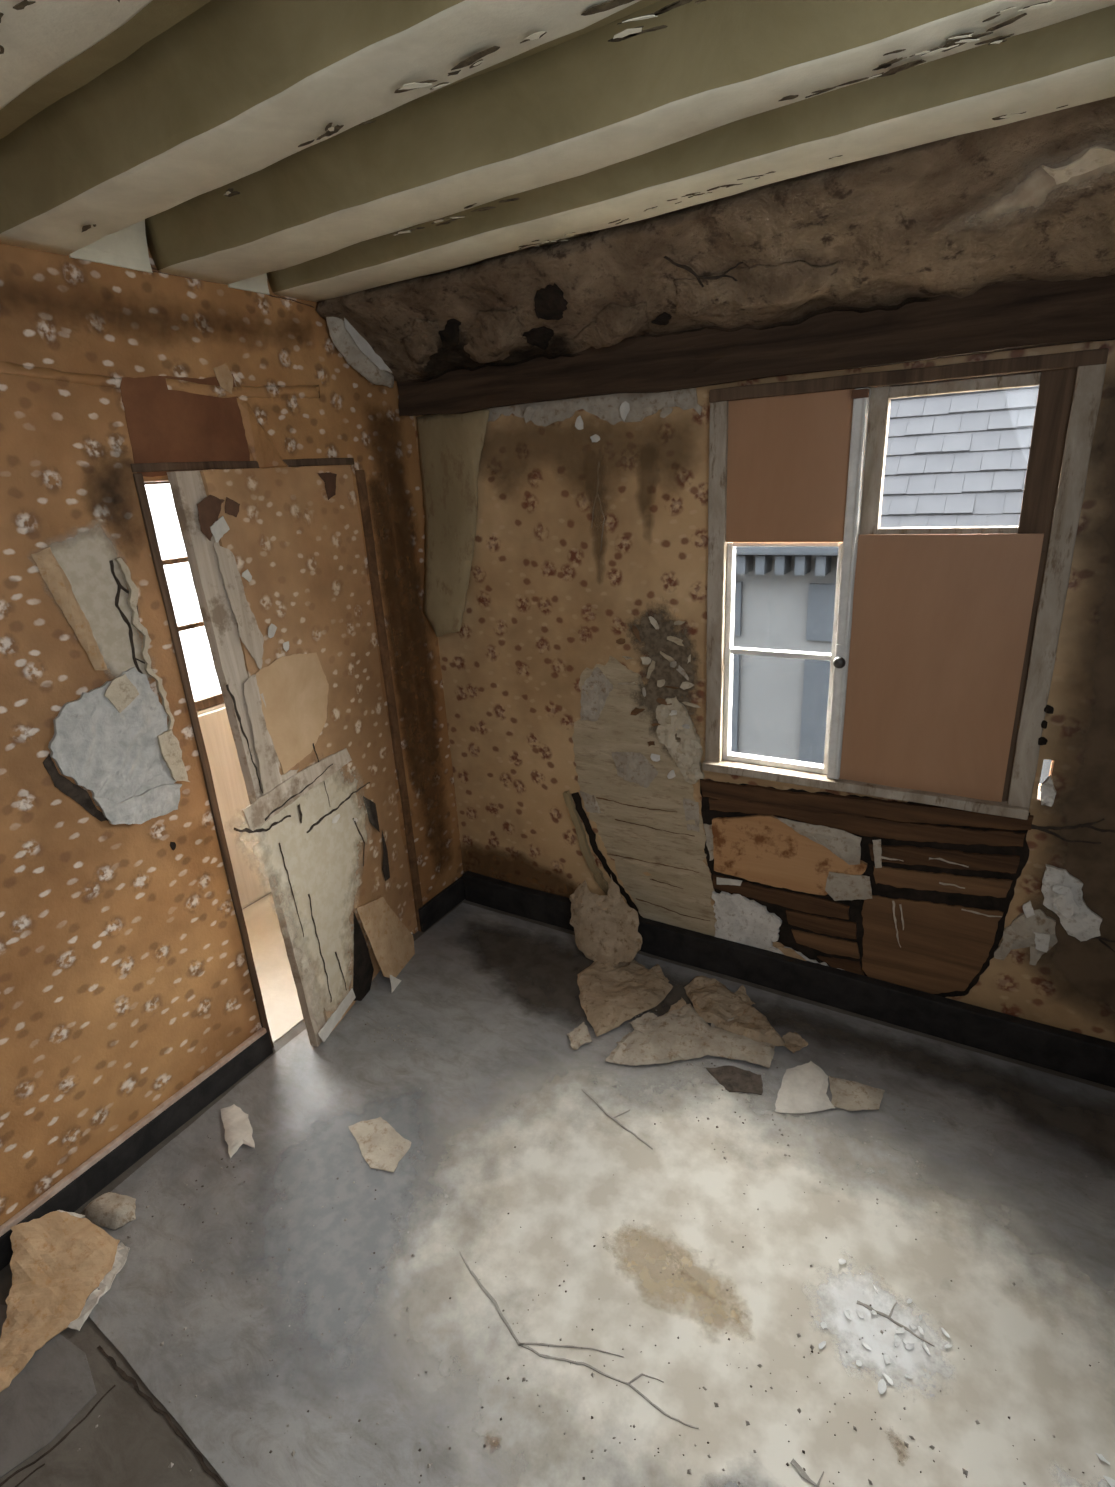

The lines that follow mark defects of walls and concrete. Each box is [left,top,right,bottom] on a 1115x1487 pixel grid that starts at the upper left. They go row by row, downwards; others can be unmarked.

peeling [0,0,36,23]
peeling [394,46,500,93]
peeling [581,0,706,42]
peeling [778,0,1055,102]
peeling [645,171,776,211]
spalling [968,143,1115,225]
damp [480,425,687,560]
spalling [31,547,190,825]
damp [629,609,697,749]
spalling [616,616,1102,997]
crack [459,1251,699,1429]
damp [257,1074,1115,1487]